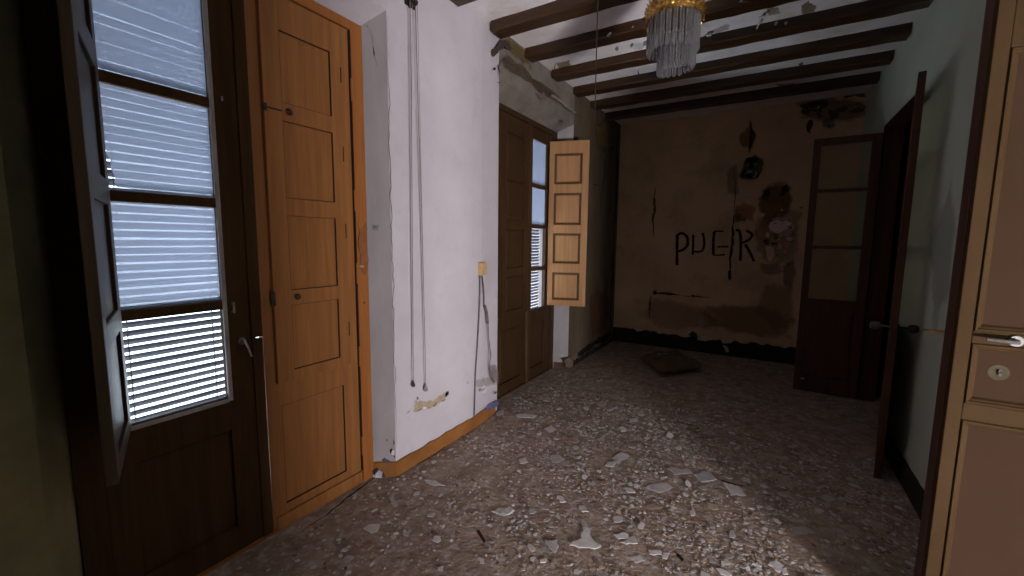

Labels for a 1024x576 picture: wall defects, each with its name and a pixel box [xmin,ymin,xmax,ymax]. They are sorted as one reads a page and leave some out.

flaking render [492,37,559,100]
flaking render [799,93,866,133]
crack [650,191,658,236]
flaking render [735,184,803,263]
flaking render [413,393,449,412]